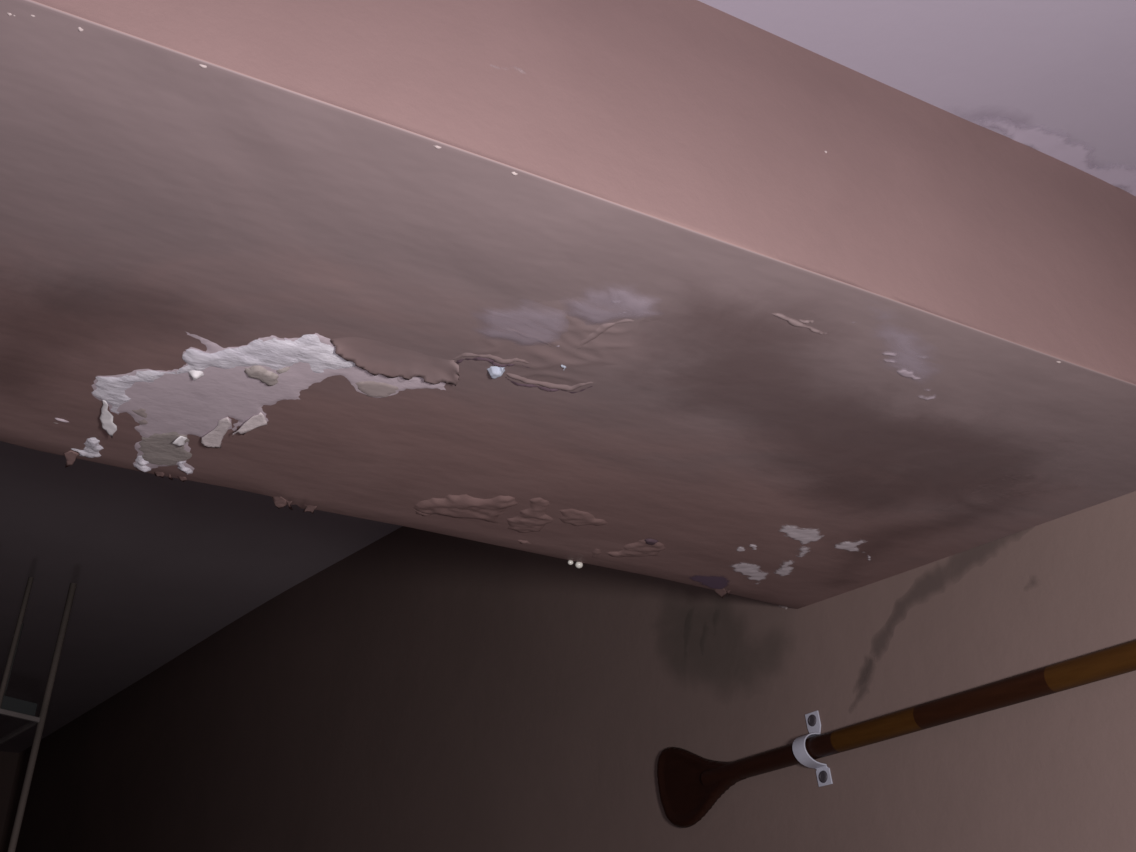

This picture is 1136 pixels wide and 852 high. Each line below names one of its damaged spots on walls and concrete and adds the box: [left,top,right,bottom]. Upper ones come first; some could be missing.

peeling [64,332,459,482]
damp [691,526,822,589]
damp [835,541,871,560]